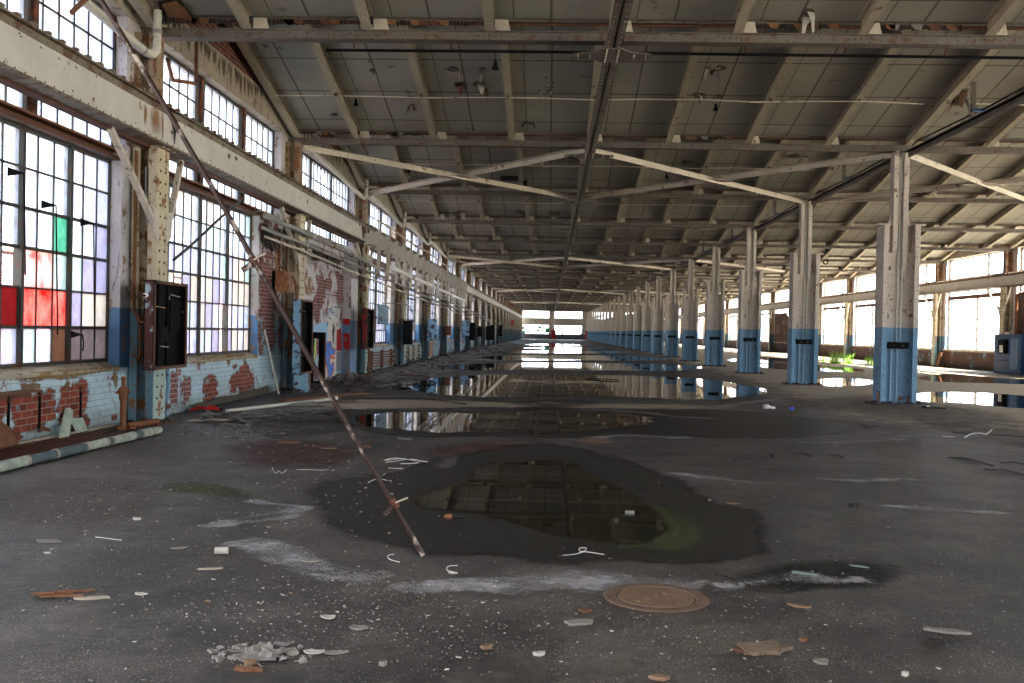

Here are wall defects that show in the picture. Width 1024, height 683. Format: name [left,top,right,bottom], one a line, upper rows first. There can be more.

peeling [259,247,276,351]
peeling [313,271,343,321]
peeling [0,378,90,441]
peeling [169,359,254,405]